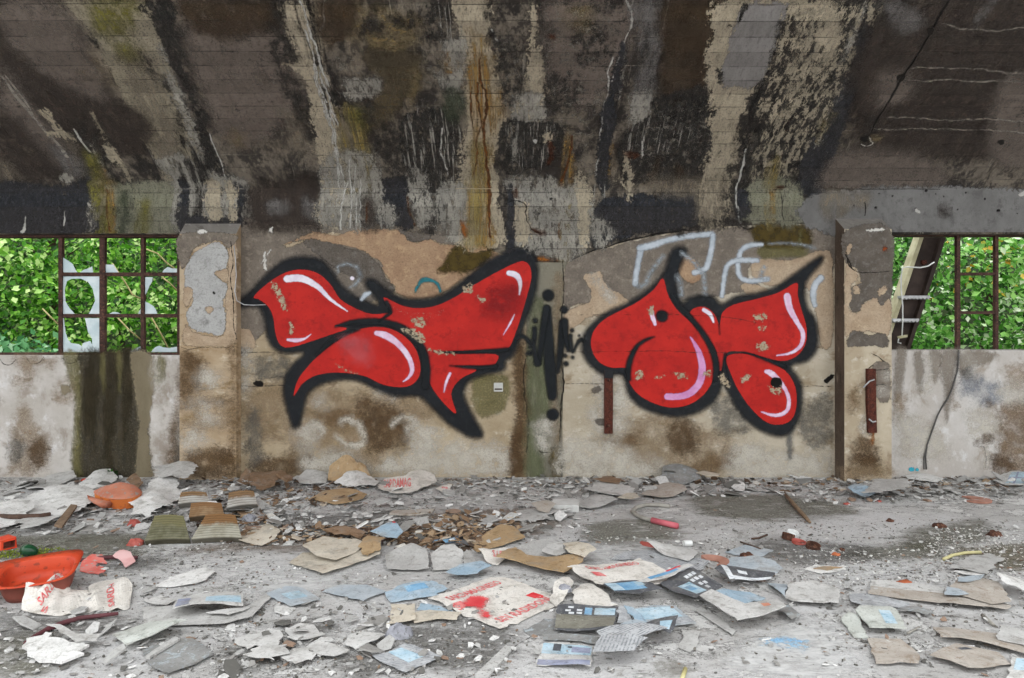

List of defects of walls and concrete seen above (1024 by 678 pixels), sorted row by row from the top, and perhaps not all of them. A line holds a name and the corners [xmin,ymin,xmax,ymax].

rust [460,33,506,250]
water stain [0,0,1024,262]
crack [861,0,950,138]
flaking render [176,216,499,356]
flaking render [562,222,895,351]
water stain [11,409,50,473]
water stain [19,339,894,479]
peeling [635,370,688,380]
peeling [703,370,750,388]
water stain [893,347,1024,472]